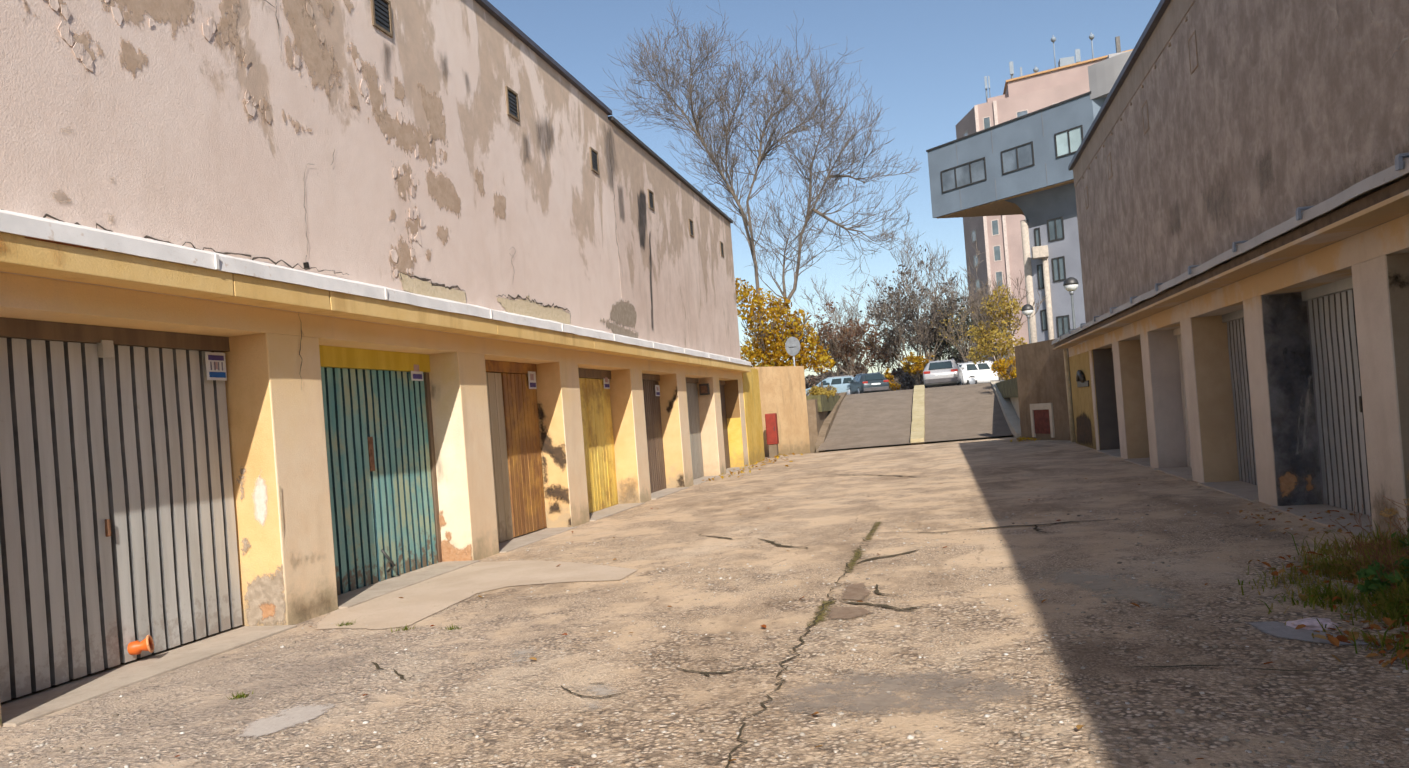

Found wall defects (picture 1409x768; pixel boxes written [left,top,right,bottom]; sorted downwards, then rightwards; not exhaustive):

peeling [49,0,251,77]
peeling [244,90,312,133]
peeling [280,0,466,303]
crack [43,150,349,275]
peeling [475,168,506,219]
flaking render [497,295,570,324]
peeling [237,469,284,534]
flaking render [244,564,286,626]
crack [677,518,1121,768]